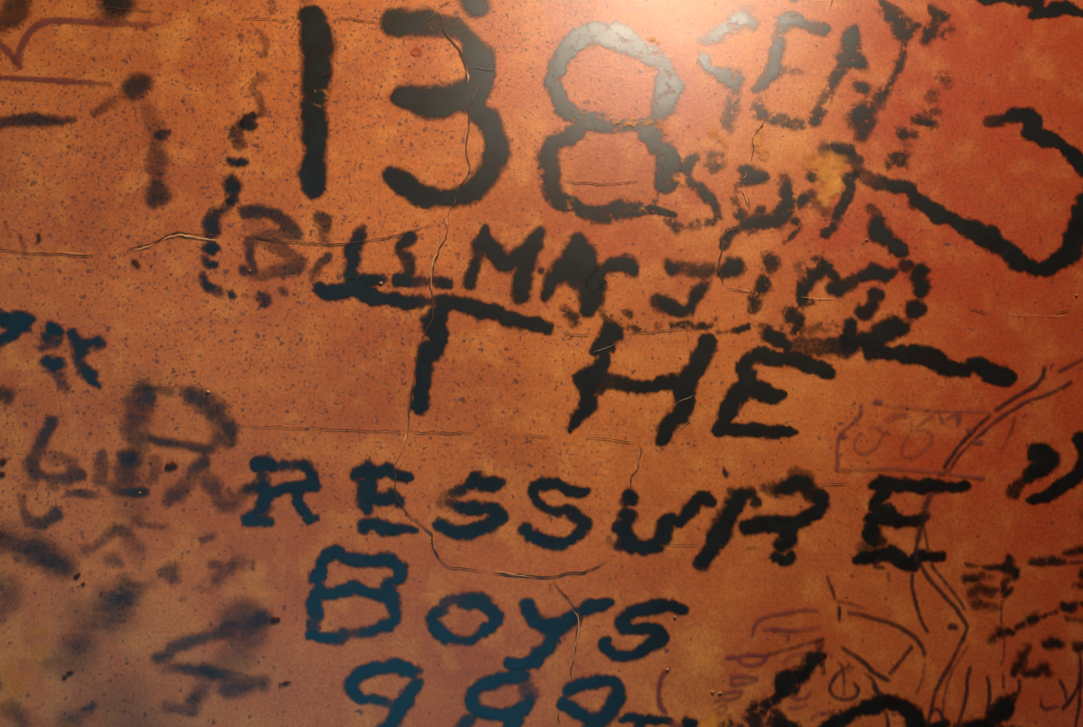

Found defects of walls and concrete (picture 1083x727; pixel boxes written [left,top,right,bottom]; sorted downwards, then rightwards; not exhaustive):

crack [570,178,642,186]
crack [0,248,97,256]
crack [127,2,611,680]
crack [565,327,700,363]
crack [590,437,642,523]